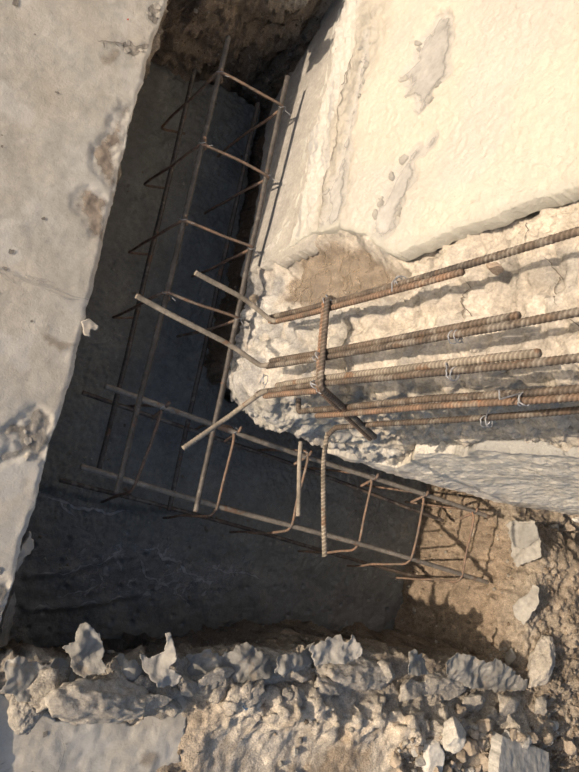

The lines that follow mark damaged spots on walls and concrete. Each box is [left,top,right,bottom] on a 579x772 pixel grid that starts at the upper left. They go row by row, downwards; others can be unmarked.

peeling [398,18,450,110]
peeling [372,150,417,234]